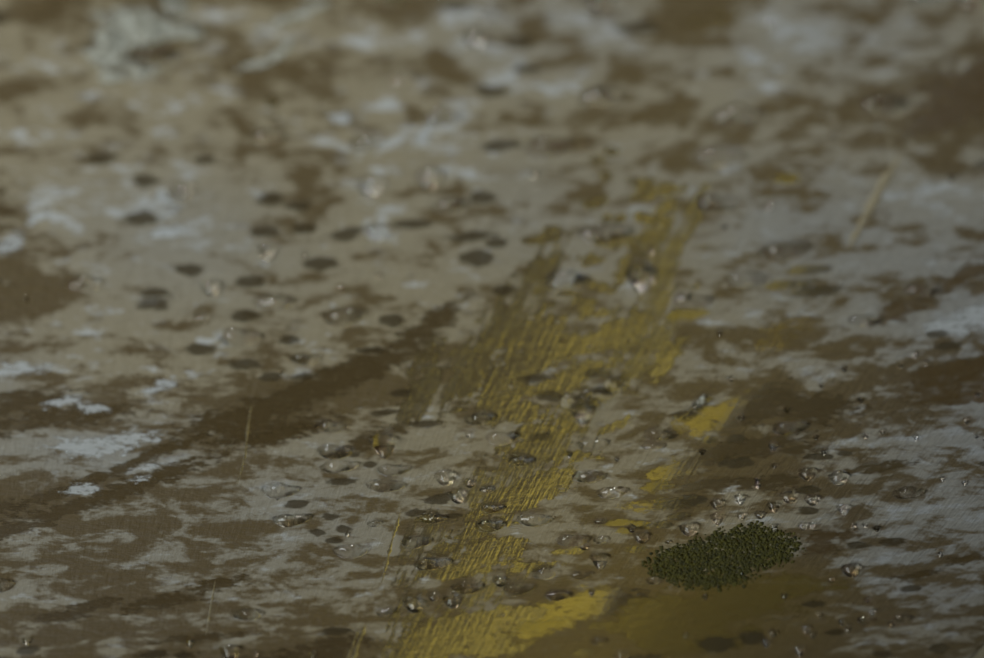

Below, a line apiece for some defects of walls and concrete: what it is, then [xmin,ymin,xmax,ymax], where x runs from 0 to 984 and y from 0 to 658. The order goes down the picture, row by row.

water stain [484,141,521,152]
spalling [561,377,627,409]
water stain [0,174,870,658]
spalling [672,397,712,421]
water stain [839,460,919,474]
water stain [803,528,903,555]